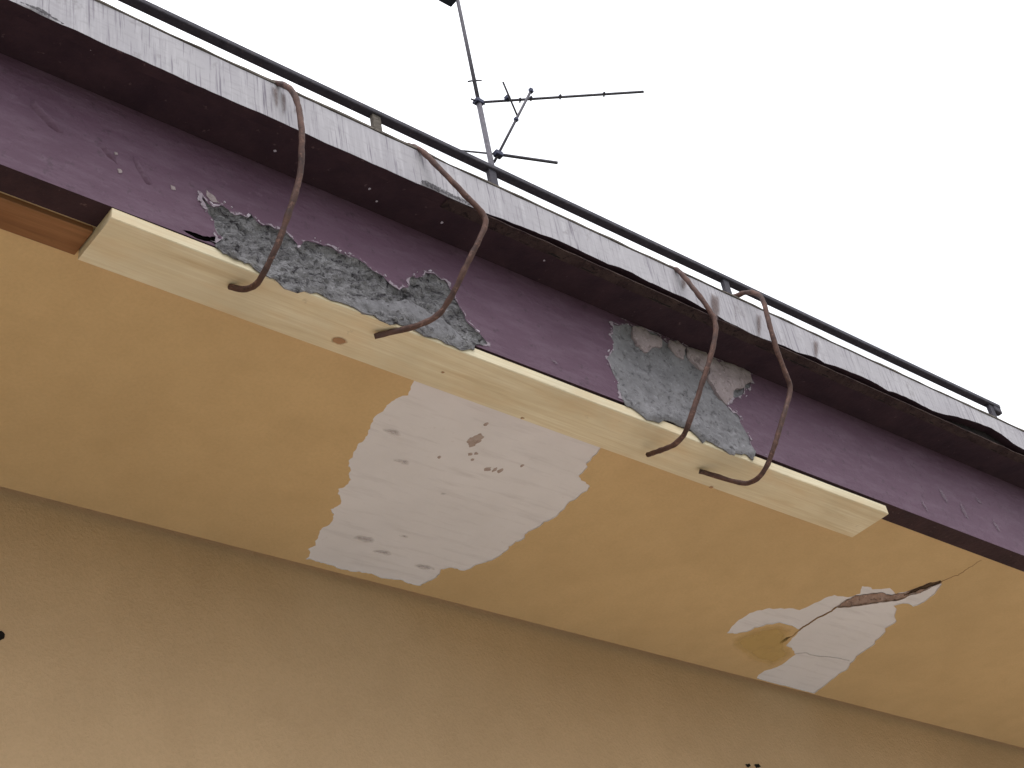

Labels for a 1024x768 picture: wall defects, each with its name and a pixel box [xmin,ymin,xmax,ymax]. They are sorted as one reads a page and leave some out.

spalling [186,190,490,351]
spalling [440,198,1024,465]
peeling [307,381,600,586]
peeling [728,583,942,694]
crack [764,560,982,651]